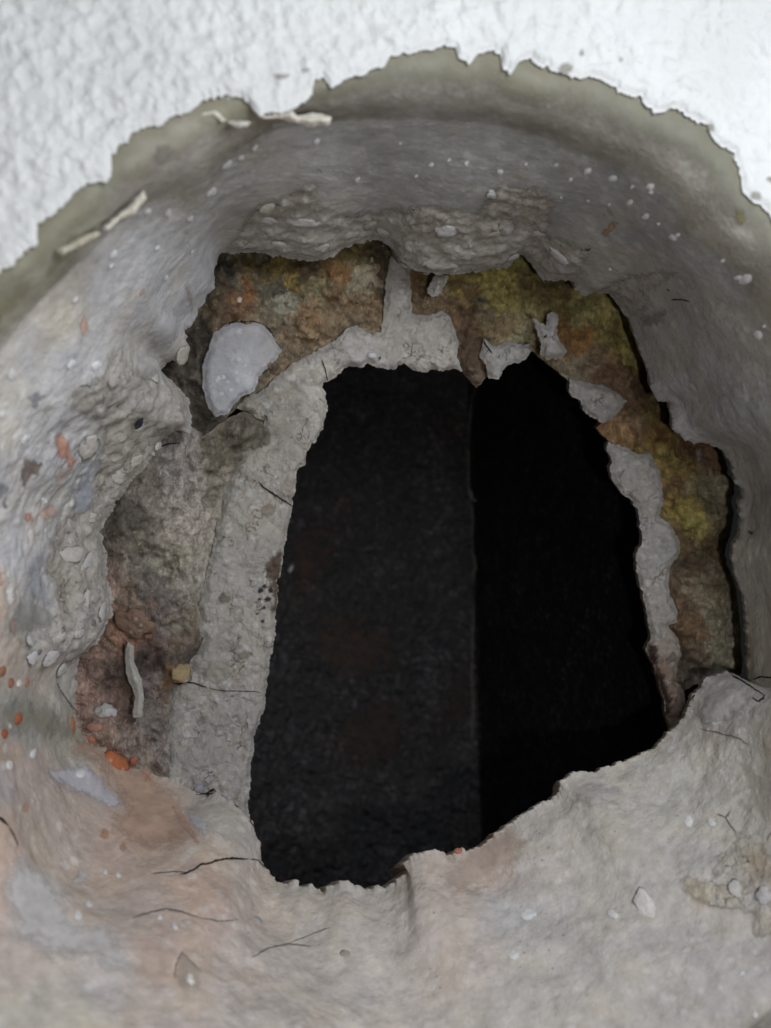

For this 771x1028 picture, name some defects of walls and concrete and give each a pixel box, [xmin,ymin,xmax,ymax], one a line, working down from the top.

peeling [0,94,331,293]
spalling [227,181,591,279]
peeling [305,45,771,257]
spalling [21,346,190,677]
crack [133,908,238,922]
crack [152,857,265,875]